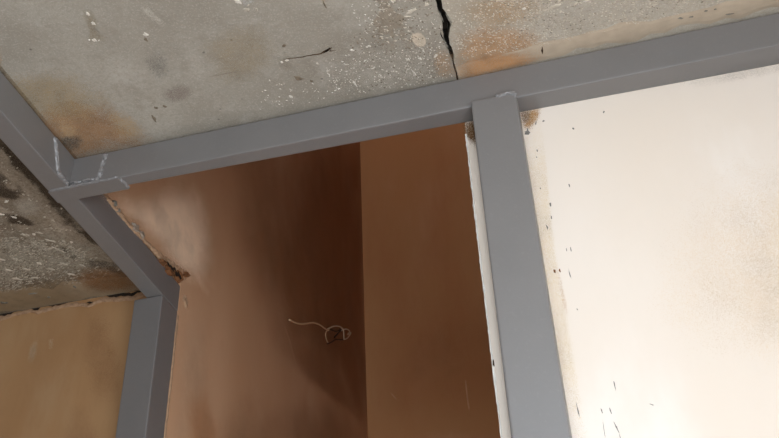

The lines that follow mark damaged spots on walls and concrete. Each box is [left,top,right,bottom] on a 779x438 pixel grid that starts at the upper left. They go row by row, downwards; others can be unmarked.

crack [436,0,458,80]
water stain [0,139,101,249]
spalling [107,198,191,283]